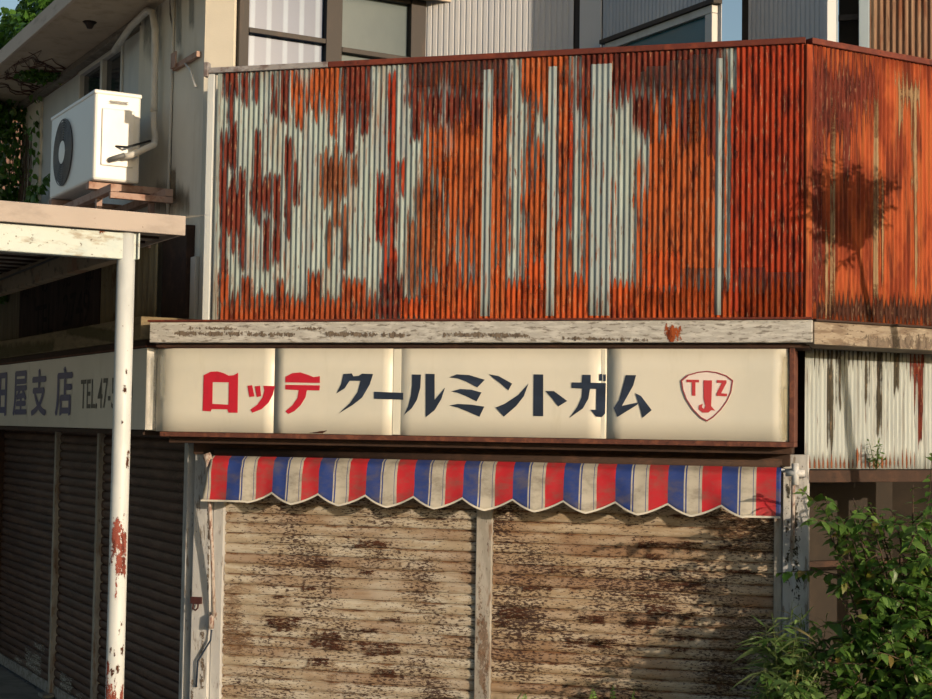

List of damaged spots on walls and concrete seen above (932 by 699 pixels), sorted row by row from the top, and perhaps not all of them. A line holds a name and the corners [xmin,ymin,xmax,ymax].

corrosion [217,44,932,342]
corrosion [809,354,924,468]
corrosion [354,538,390,548]
corrosion [638,541,748,560]
corrosion [623,580,701,630]
corrosion [265,615,302,633]
corrosion [577,614,606,625]
corrosion [304,631,348,668]
corrosion [359,617,403,657]
corrosion [565,636,622,650]
corrosion [662,633,696,655]
corrosion [371,668,397,680]